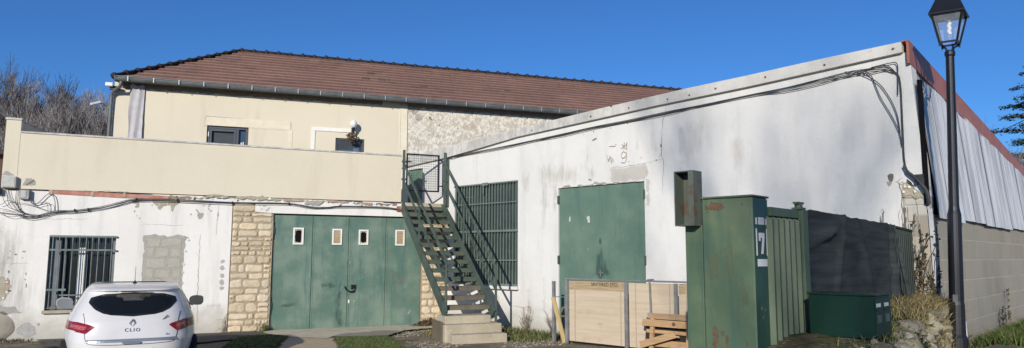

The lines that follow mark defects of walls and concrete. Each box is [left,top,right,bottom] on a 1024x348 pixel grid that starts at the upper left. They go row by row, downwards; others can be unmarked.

peeling [0,250,40,337]
peeling [141,234,189,289]